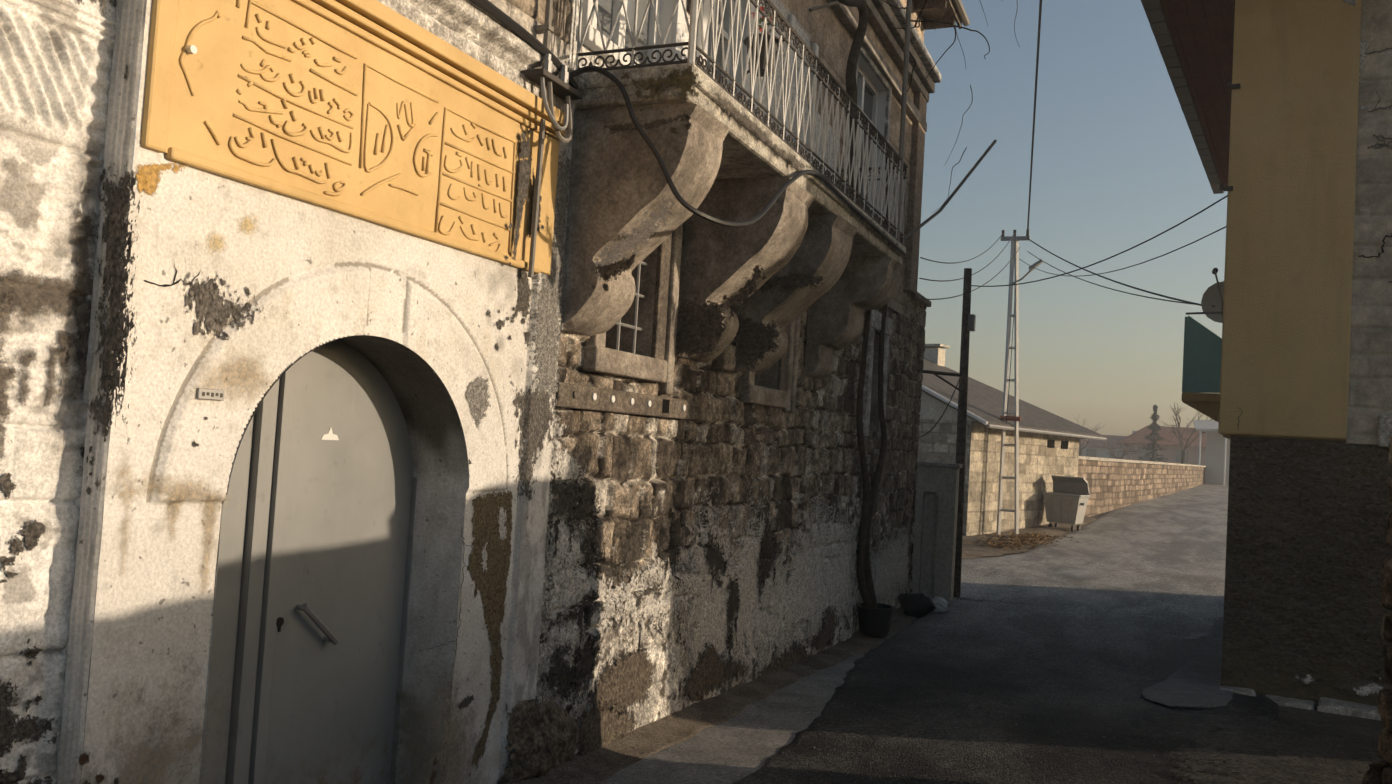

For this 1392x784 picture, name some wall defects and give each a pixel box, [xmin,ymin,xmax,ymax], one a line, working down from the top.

crack [1367,92,1392,149]
crack [1358,233,1392,283]
peeling [79,161,140,495]
peeling [182,271,264,341]
flaking render [458,128,574,777]
peeling [0,518,47,583]
water stain [542,473,781,707]
peeling [19,638,43,667]
spalling [0,679,58,784]